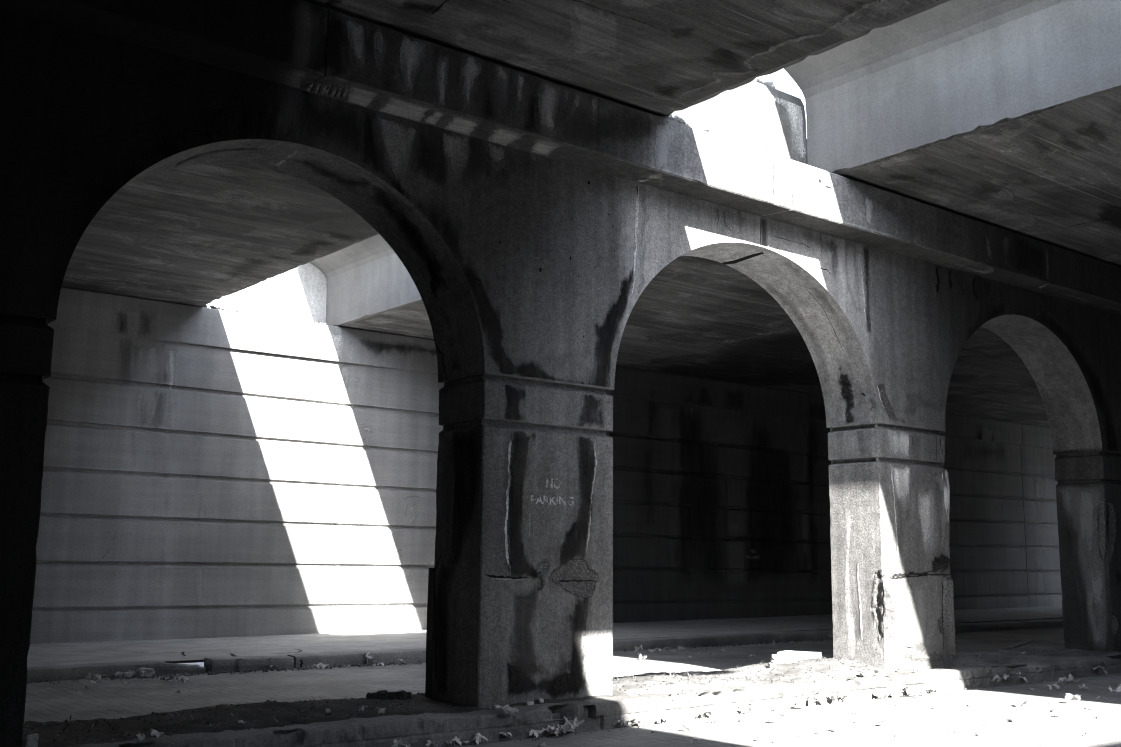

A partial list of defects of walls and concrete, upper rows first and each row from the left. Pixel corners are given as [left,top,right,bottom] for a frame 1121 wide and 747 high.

water stain [399,38,426,87]
water stain [462,56,480,98]
water stain [840,369,853,423]
spalling [467,271,634,697]
crack [484,572,544,589]
water stain [512,592,540,675]
spalling [872,571,896,641]
spalling [905,576,956,662]